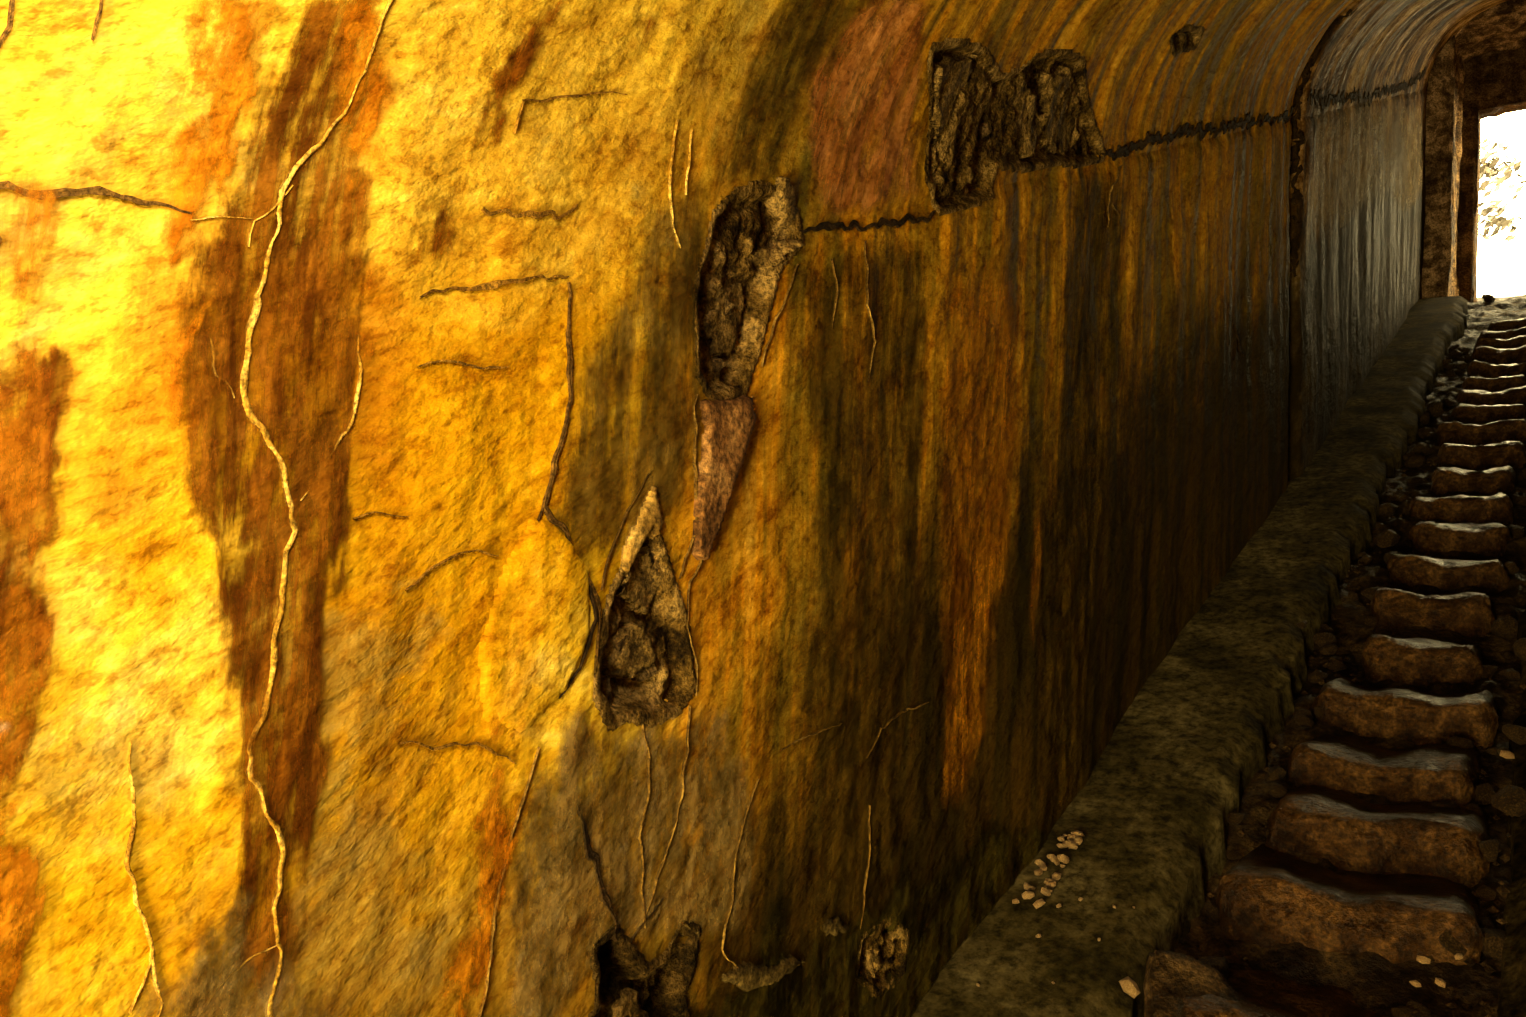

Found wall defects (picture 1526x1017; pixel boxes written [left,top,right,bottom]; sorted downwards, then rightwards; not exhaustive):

corrosion [167,0,272,265]
corrosion [340,0,391,156]
spalling [924,38,1106,216]
corrosion [15,186,57,296]
corrosion [167,307,204,423]
spalling [691,176,806,561]
corrosion [0,343,66,814]
crack [0,0,393,1017]
spalling [593,486,698,732]
corrosion [0,831,45,1017]
spalling [588,921,701,1017]